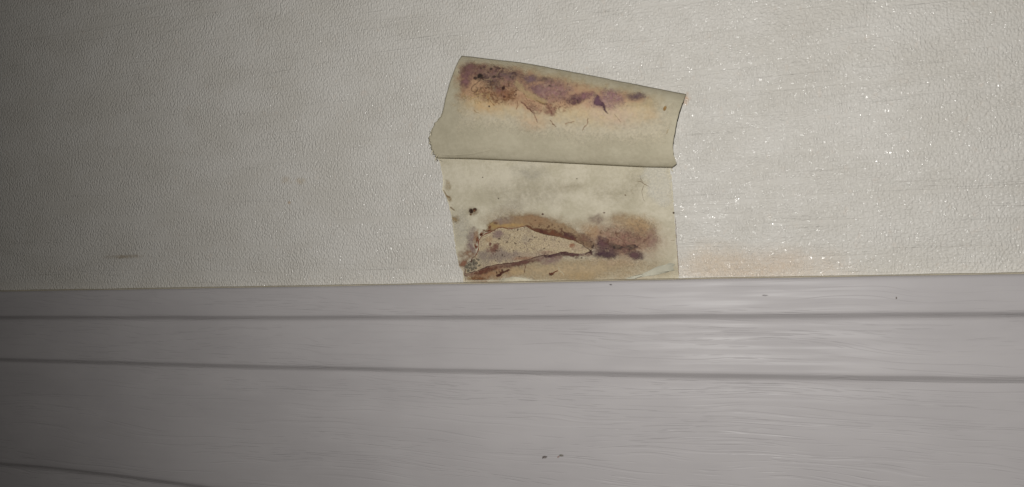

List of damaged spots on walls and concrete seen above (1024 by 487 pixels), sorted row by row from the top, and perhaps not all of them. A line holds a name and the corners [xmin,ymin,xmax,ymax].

water stain [457,64,669,140]
peeling [438,158,679,285]
water stain [459,212,658,280]